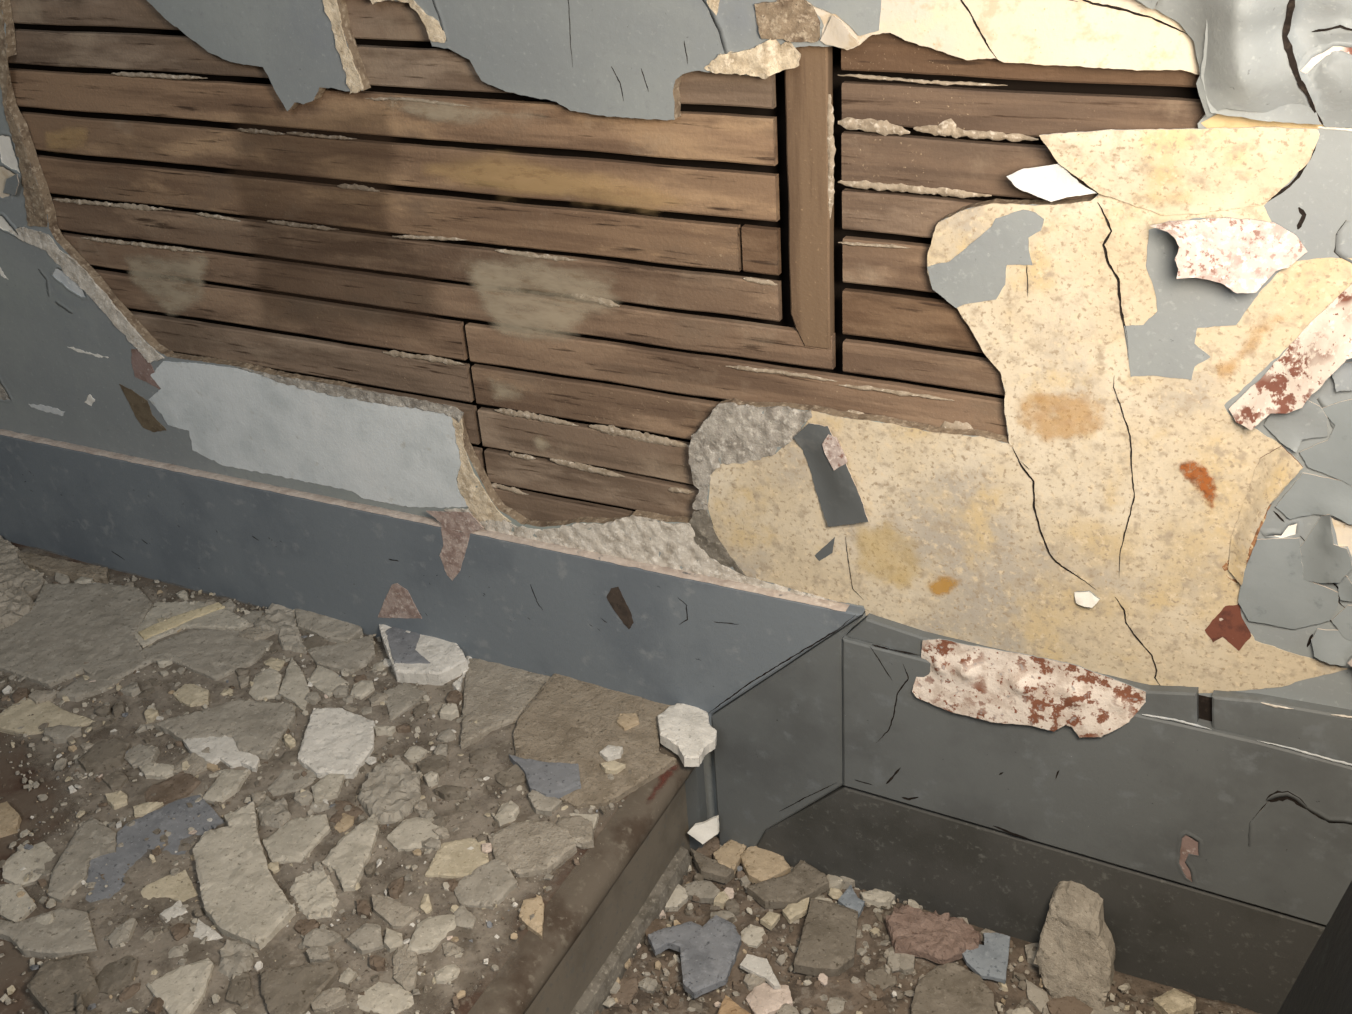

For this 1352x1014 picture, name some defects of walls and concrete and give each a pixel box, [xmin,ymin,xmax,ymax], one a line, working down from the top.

crack [703,0,733,54]
crack [960,0,998,60]
crack [1071,0,1187,34]
crack [1269,0,1352,230]
crack [1334,220,1352,263]
flaking render [0,0,1352,693]
crack [1012,202,1160,685]
crack [1248,790,1352,848]